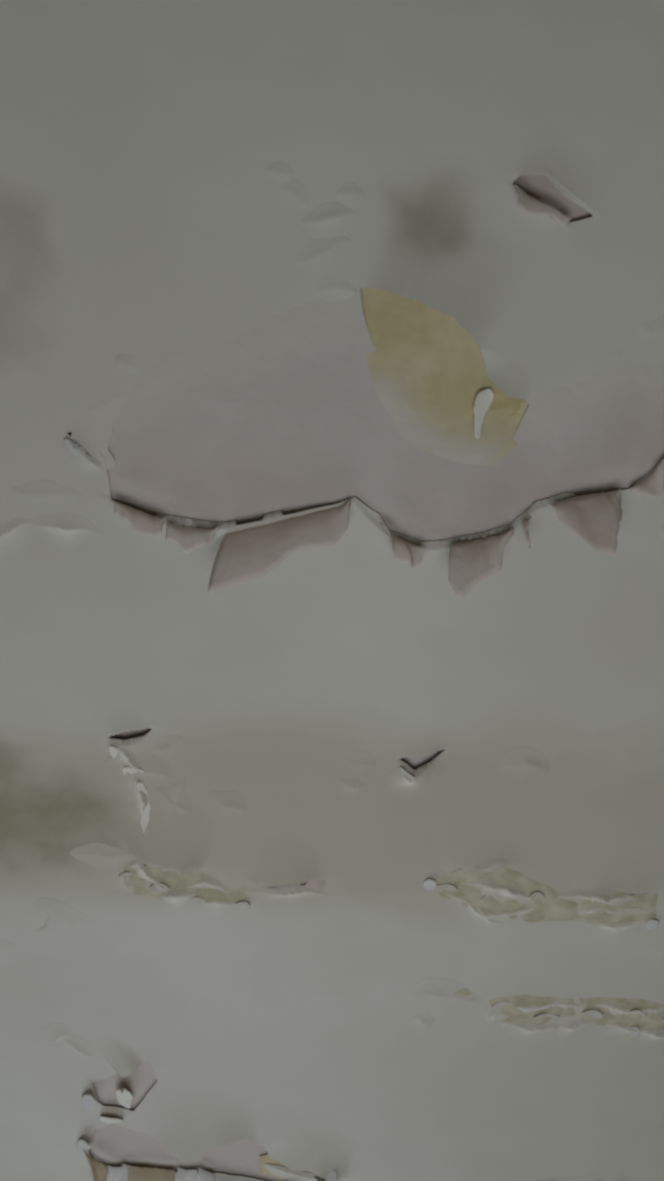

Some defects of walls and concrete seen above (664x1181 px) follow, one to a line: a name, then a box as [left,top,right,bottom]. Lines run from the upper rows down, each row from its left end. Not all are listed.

peeling [502,165,604,233]
peeling [59,258,664,599]
peeling [391,745,453,780]
peeling [68,838,328,920]
peeling [423,859,659,943]
peeling [400,978,664,1048]
peeling [66,1053,353,1181]